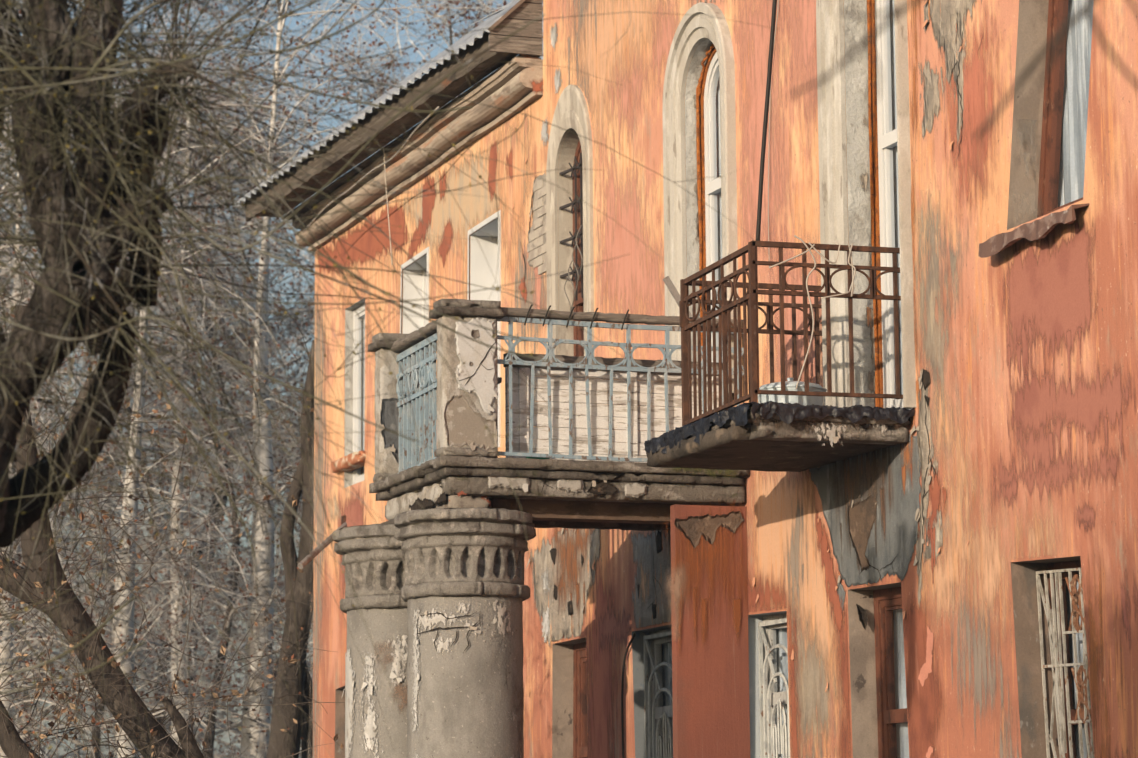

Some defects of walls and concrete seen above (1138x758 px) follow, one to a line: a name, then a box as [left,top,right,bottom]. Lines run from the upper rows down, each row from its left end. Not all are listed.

peeling [918,0,994,203]
peeling [444,316,498,451]
peeling [910,199,1005,636]
leakage [991,218,1135,506]
peeling [341,599,515,758]
spalling [525,528,602,647]
peeling [631,471,844,758]
leakage [834,448,891,548]
spalling [848,495,877,571]
spalling [856,595,873,630]
peeling [918,626,934,687]